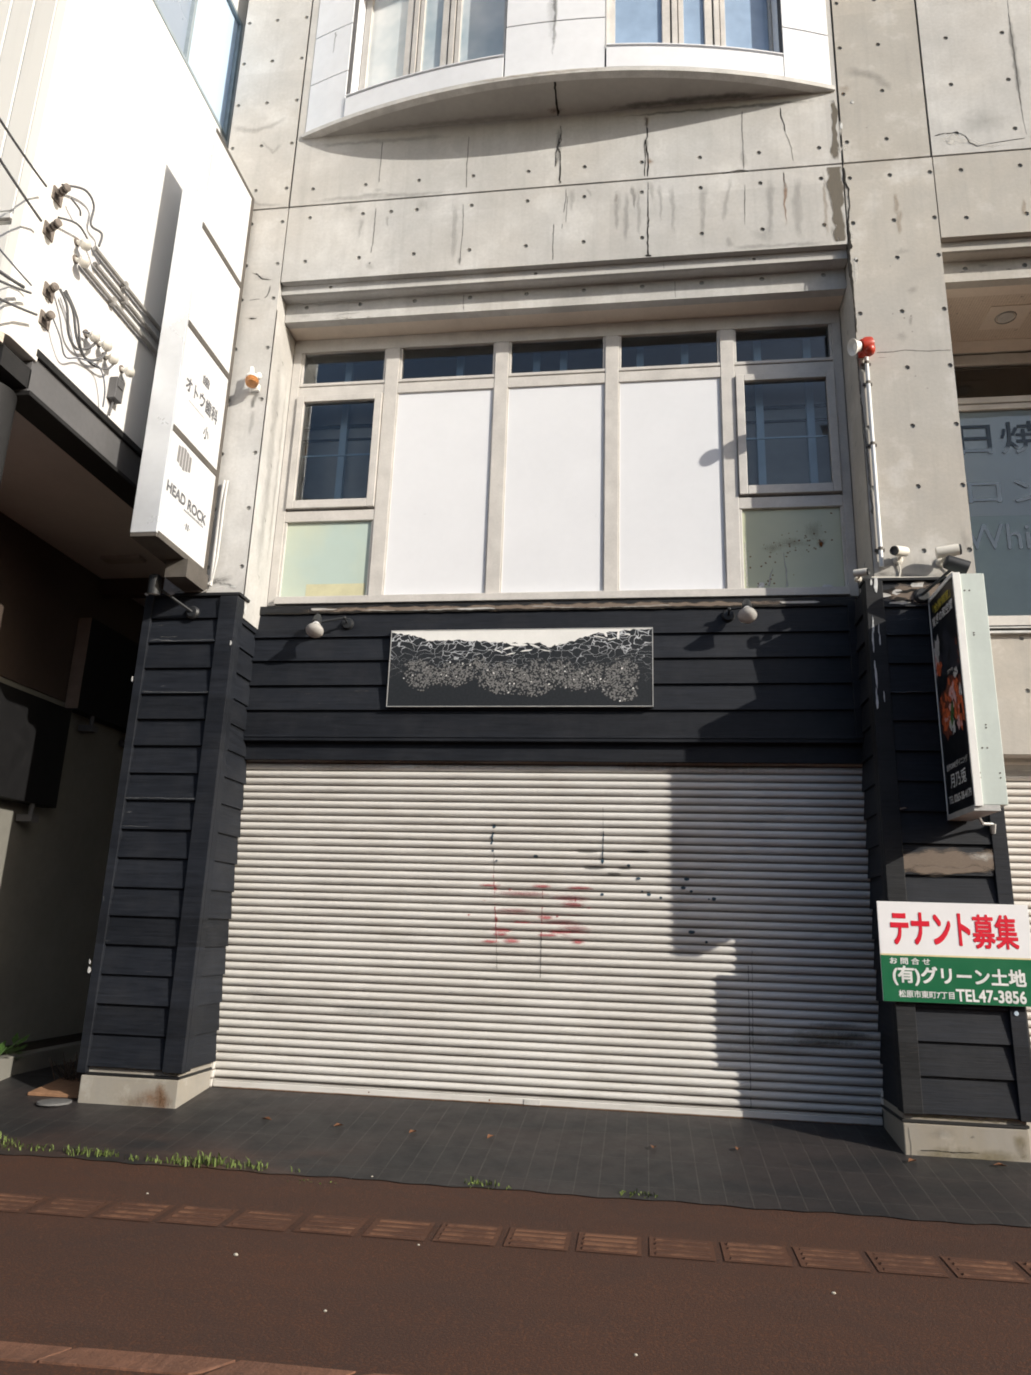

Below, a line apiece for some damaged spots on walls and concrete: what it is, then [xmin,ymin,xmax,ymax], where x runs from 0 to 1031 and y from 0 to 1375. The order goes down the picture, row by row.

crack [1007,2,1027,133]
crack [552,128,568,259]
water stain [827,102,846,241]